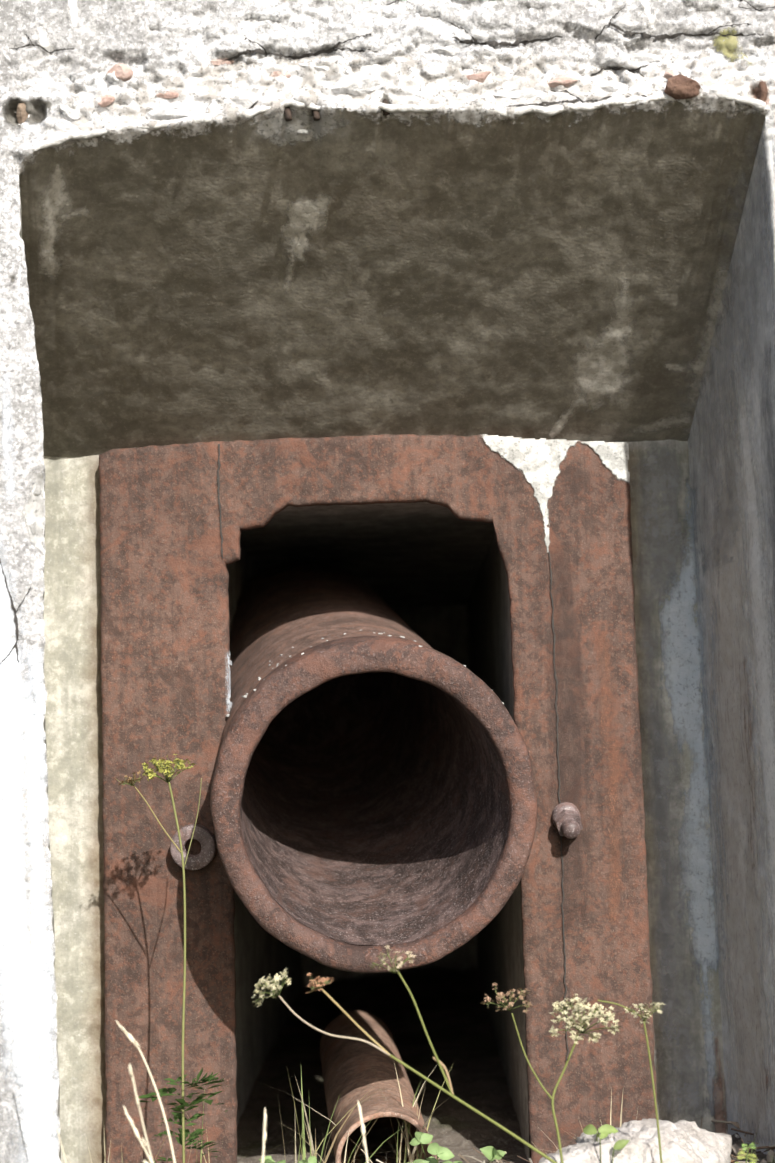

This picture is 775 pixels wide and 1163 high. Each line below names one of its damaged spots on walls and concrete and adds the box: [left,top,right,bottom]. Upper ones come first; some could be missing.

crack [10,34,74,55]
crack [226,33,379,61]
crack [449,22,563,46]
crack [506,0,775,107]
spalling [6,43,775,175]
leakage [282,194,329,280]
leakage [764,127,775,306]
leakage [549,278,633,439]
leakage [666,270,733,402]
crack [0,560,31,664]
leakage [633,355,775,1145]